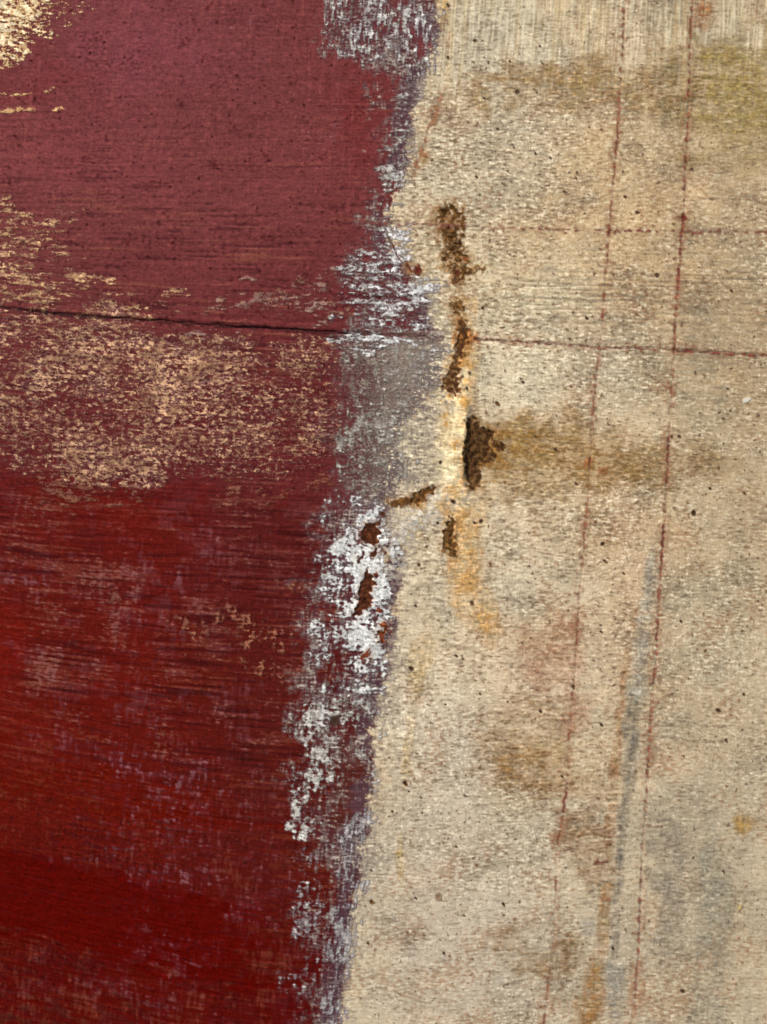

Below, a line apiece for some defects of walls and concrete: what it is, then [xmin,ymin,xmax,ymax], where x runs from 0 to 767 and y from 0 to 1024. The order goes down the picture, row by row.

rust [432,198,486,320]
crack [5,307,361,334]
peeling [0,0,472,868]
water stain [483,415,659,488]